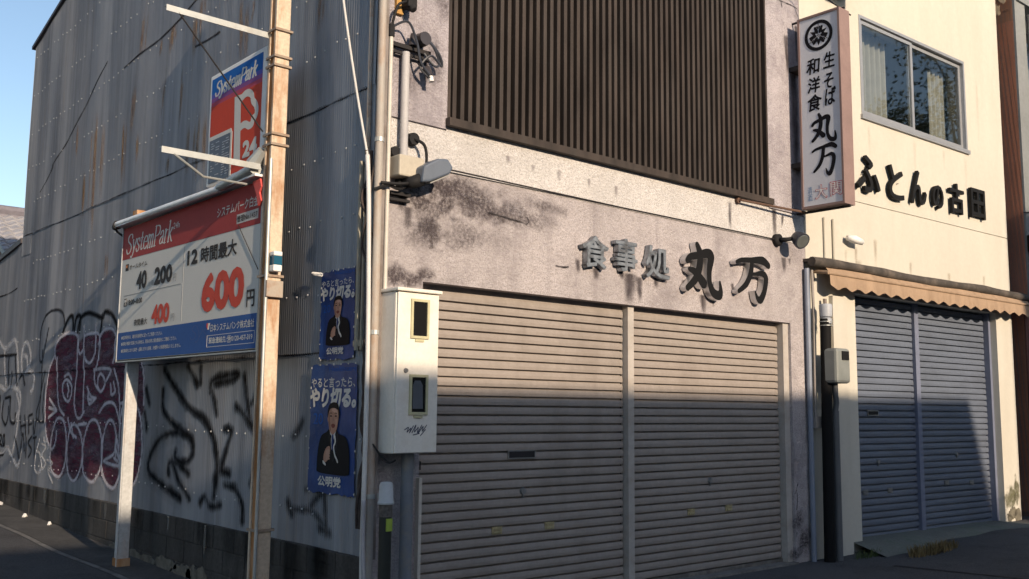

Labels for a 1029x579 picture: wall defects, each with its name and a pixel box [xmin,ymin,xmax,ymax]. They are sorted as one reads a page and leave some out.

damp [400,179,535,247]
mould [388,267,433,286]
damp [620,272,641,297]